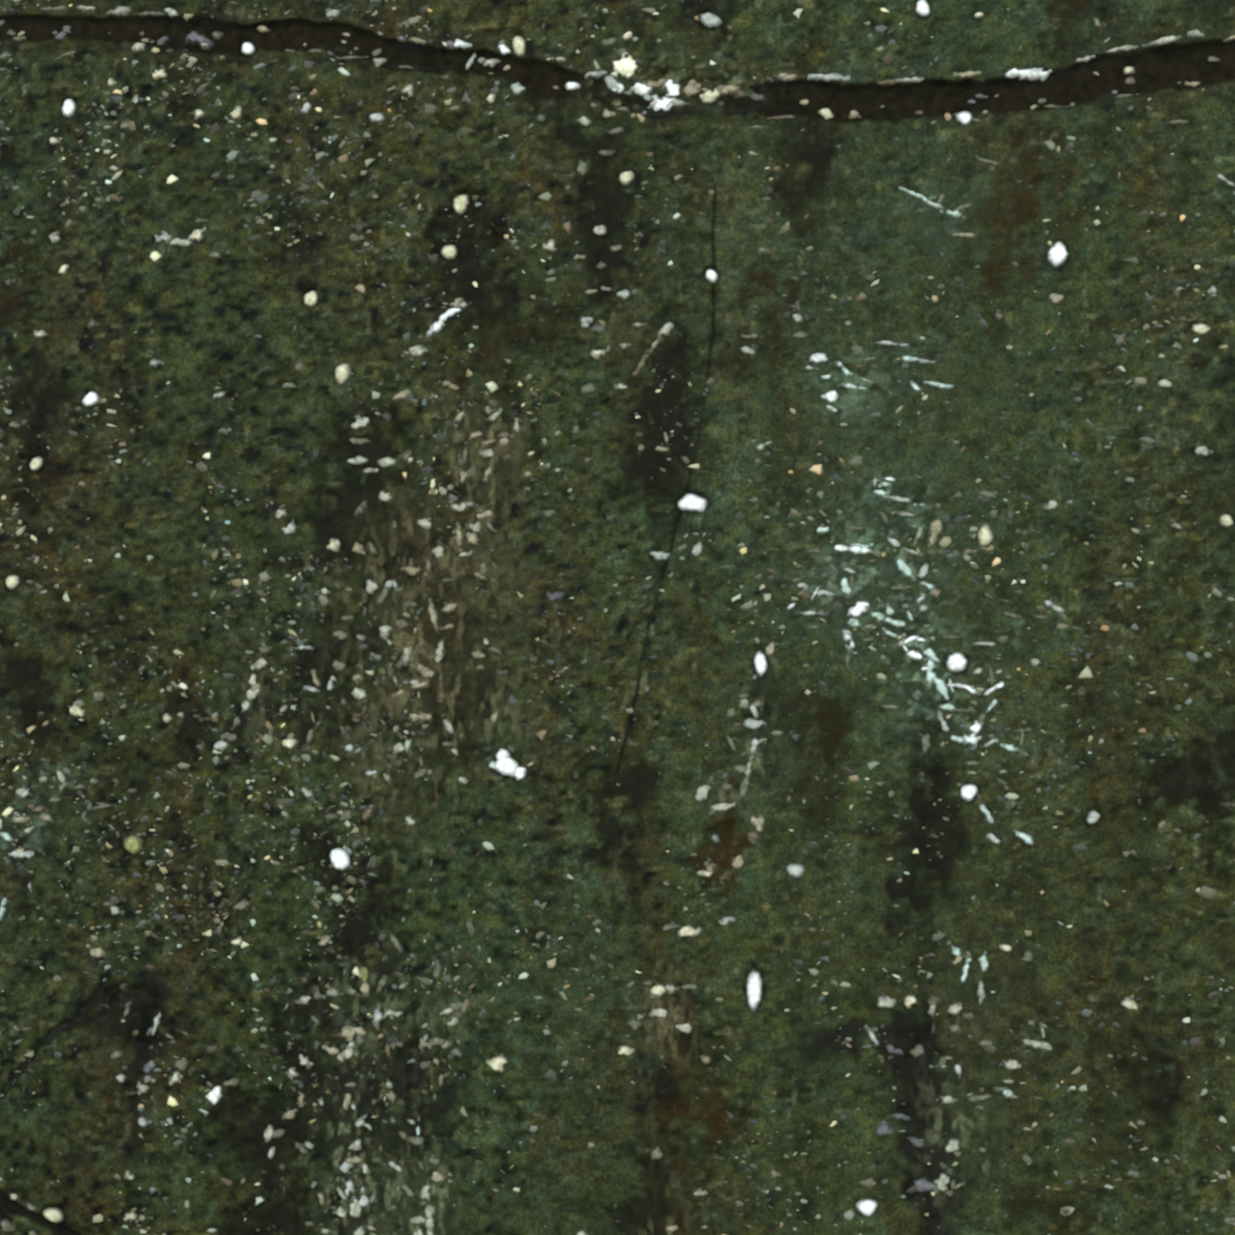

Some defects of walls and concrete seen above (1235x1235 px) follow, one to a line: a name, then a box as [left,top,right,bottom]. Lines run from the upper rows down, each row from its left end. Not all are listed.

crack [0,5,1235,130]
crack [0,977,126,1099]
crack [0,1194,81,1235]